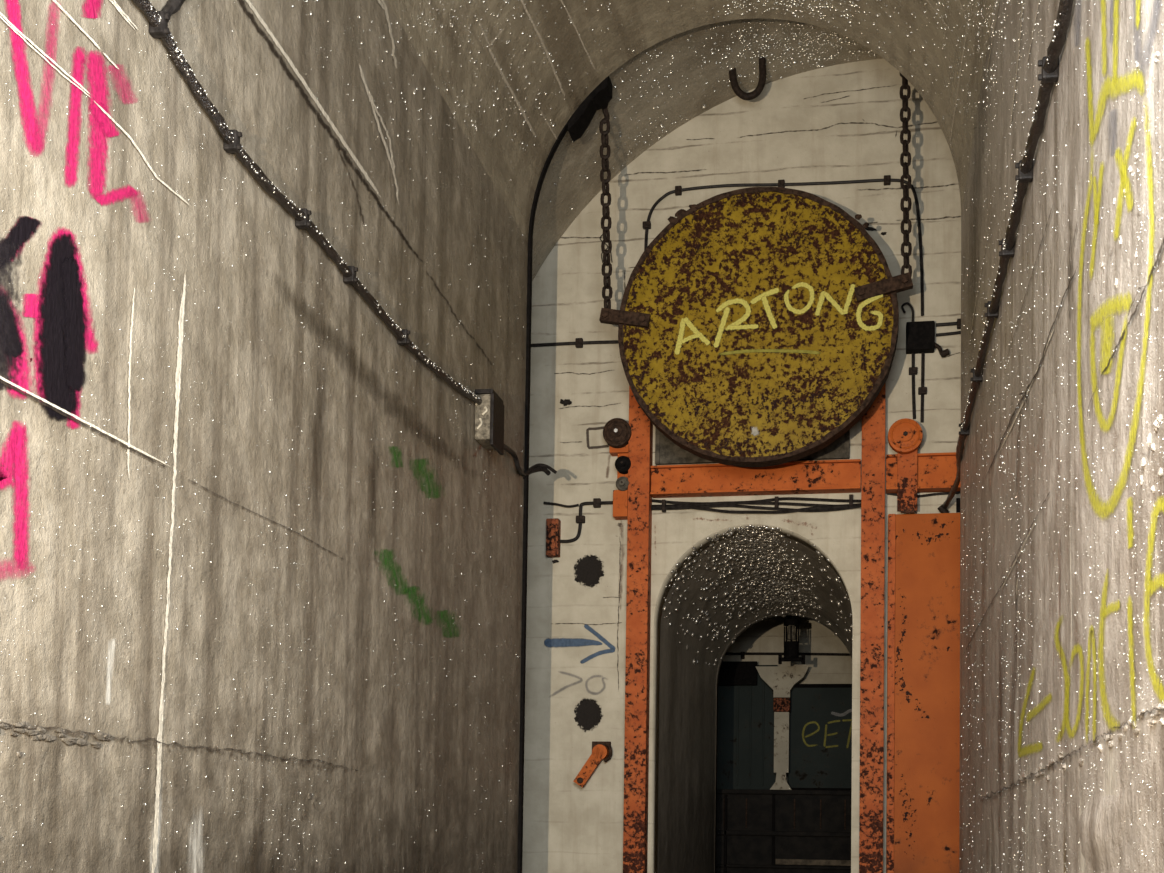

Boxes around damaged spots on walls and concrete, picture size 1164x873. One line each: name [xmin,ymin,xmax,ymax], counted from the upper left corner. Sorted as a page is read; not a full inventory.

crack [988,208,1077,486]
crack [1087,238,1164,417]
corrosion [895,521,960,545]
corrosion [895,588,929,719]
corrosion [899,774,934,859]